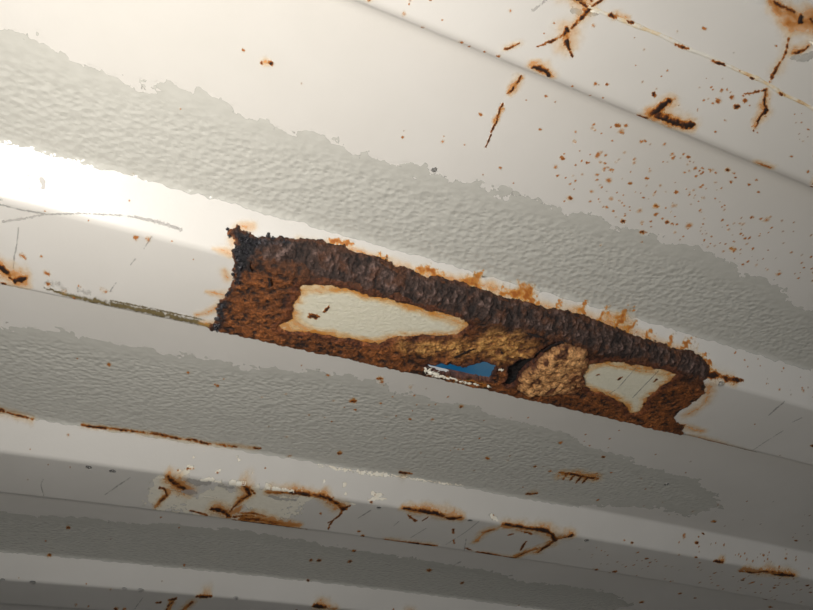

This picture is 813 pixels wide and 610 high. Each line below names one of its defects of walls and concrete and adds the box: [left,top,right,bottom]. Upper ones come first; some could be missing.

rust [768,0,813,83]
rust [637,92,696,130]
rust [0,262,28,286]
rust [208,225,744,445]
peeling [142,451,313,524]
peeling [318,464,463,487]
rust [548,470,599,484]
rust [733,552,796,608]